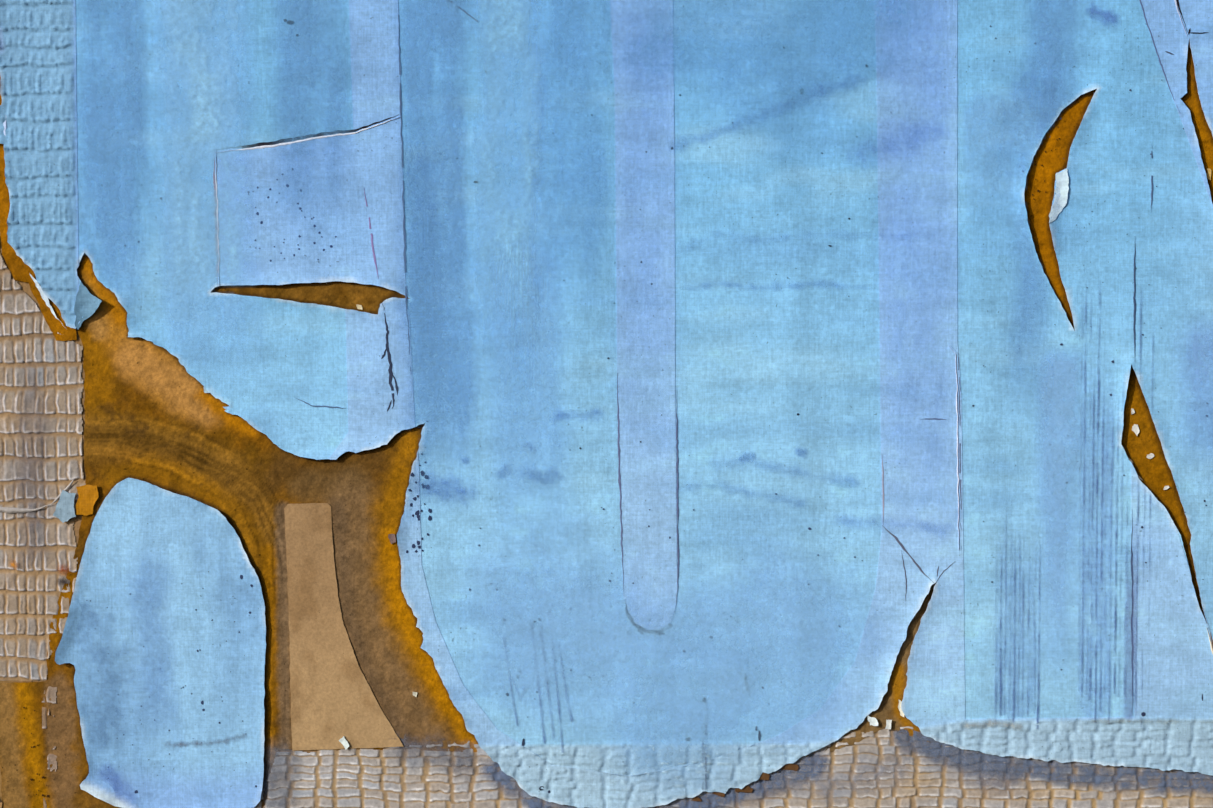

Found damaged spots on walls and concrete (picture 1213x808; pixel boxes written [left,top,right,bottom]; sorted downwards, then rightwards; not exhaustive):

crack [213,14,411,411]
peeling [1022,89,1097,331]
crack [1139,0,1208,108]
peeling [1180,41,1213,203]
peeling [0,120,478,808]
peeling [1109,364,1207,623]
peeling [692,763,799,801]
peeling [825,583,936,752]